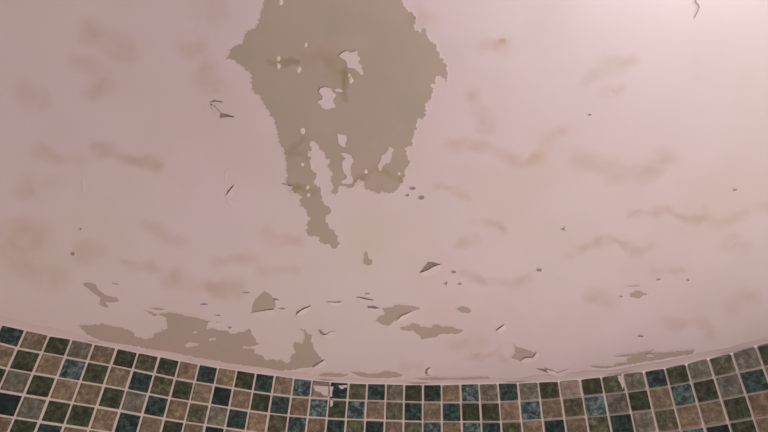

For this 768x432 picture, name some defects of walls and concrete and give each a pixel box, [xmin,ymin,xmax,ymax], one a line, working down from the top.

peeling [224,0,449,250]
peeling [420,262,441,277]
peeling [81,281,121,309]
peeling [242,291,286,320]
peeling [356,292,465,341]
peeling [76,306,492,381]
peeling [510,343,568,376]
peeling [590,348,696,370]